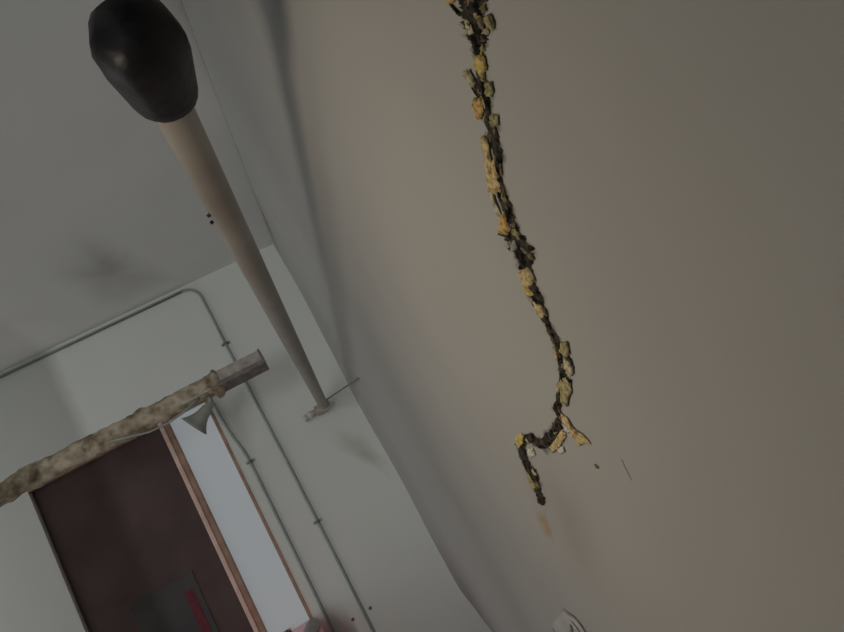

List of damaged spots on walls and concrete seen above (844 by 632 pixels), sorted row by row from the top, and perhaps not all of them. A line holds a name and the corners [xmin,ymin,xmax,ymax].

crack [445,0,590,505]